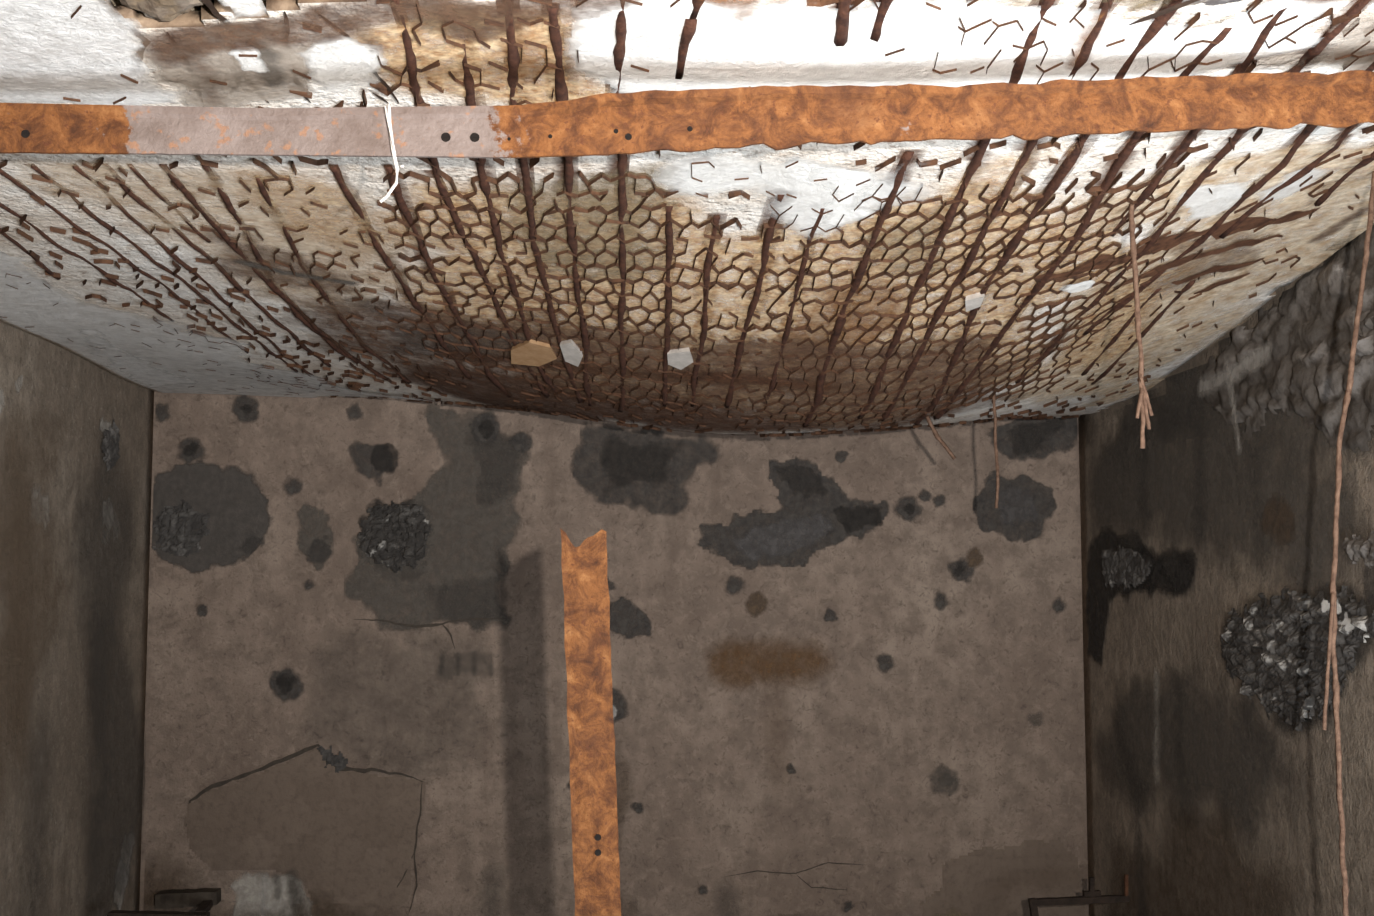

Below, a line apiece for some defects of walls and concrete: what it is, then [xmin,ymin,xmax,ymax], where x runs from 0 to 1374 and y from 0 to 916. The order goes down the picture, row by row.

peeling [0,0,204,105]
peeling [221,0,265,15]
peeling [230,49,266,73]
peeling [304,36,386,92]
peeling [572,0,1340,93]
peeling [662,156,921,233]
peeling [0,253,427,401]
spalling [1200,222,1374,453]
spalling [357,500,433,579]
spalling [1220,531,1374,731]
crack [397,785,422,914]